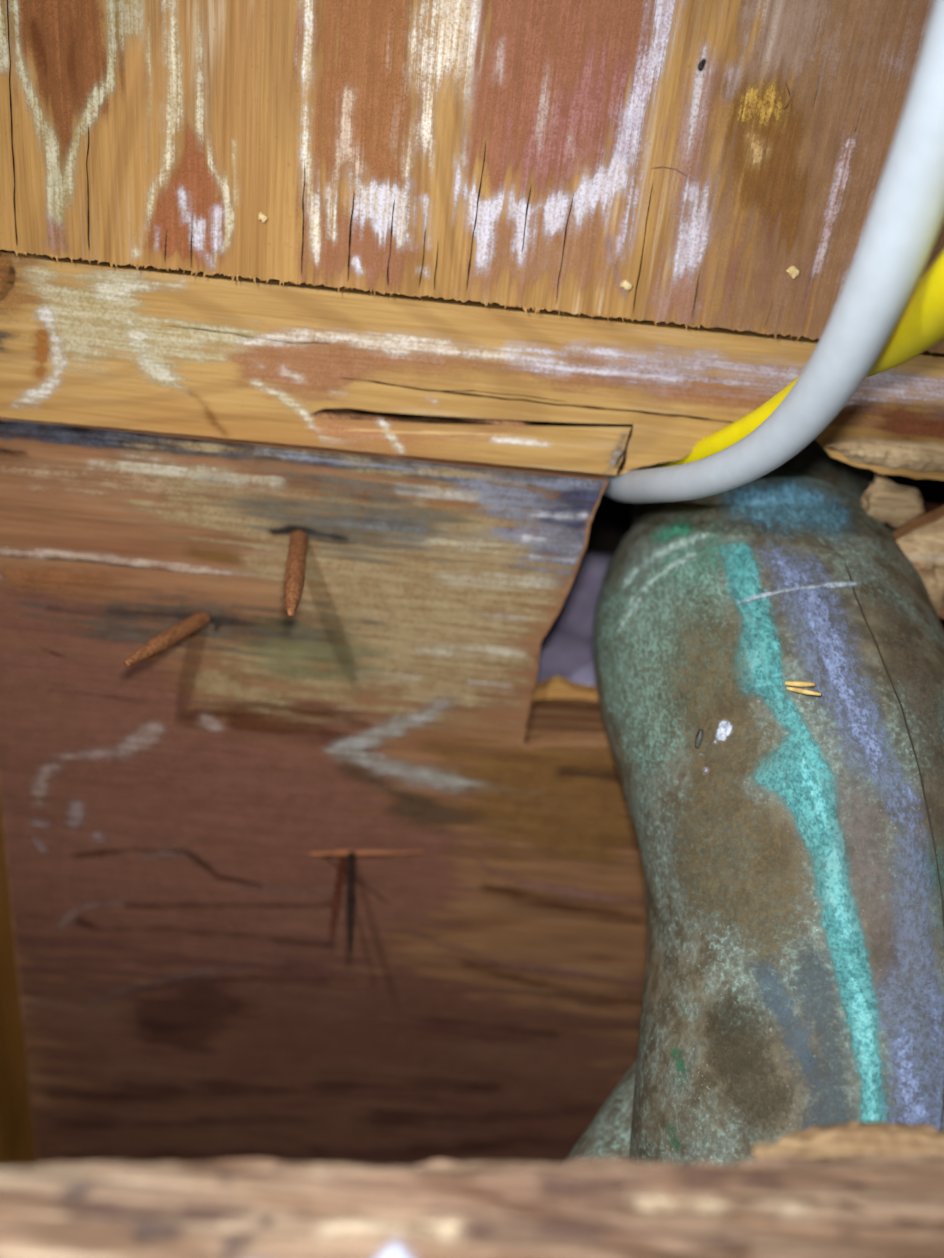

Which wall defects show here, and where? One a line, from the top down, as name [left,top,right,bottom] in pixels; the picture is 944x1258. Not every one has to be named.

water stain [0,0,237,264]
water stain [294,0,675,293]
water stain [654,0,933,338]
crack [165,229,192,264]
crack [556,189,575,303]
crack [633,166,710,316]
crack [169,325,325,344]
crack [339,377,734,475]
water stain [0,253,944,1172]
water stain [62,1185,243,1243]
peeling [380,1245,406,1258]
water stain [320,1220,489,1239]